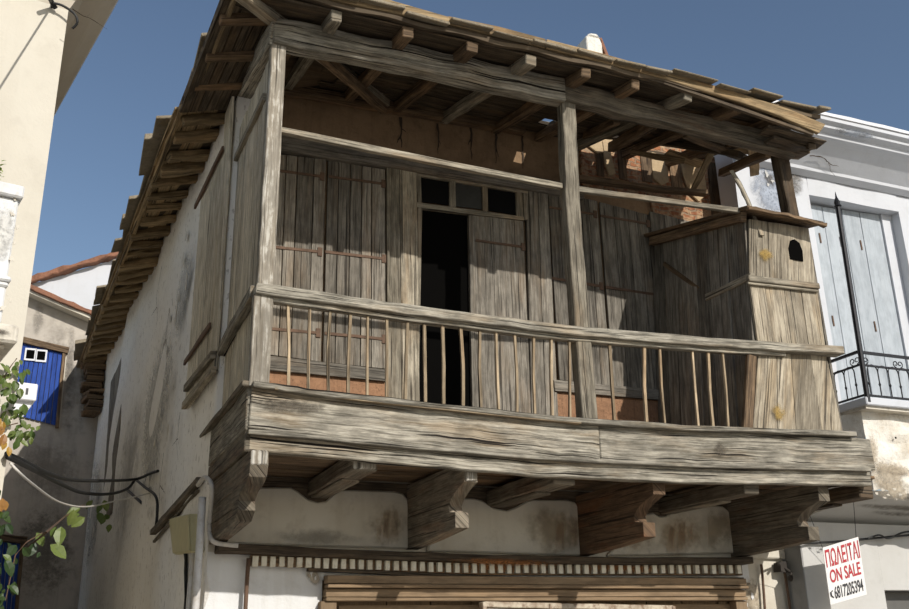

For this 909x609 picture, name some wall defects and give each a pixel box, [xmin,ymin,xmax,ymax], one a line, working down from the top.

spalling [875,483,907,500]